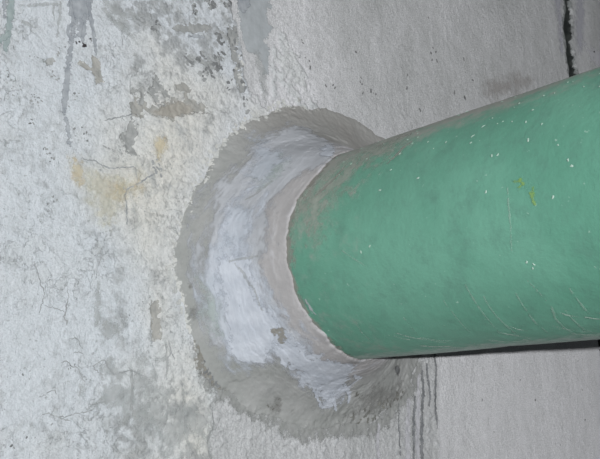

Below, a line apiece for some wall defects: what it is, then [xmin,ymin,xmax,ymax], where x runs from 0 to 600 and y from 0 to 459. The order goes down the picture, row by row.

damp [59,0,97,147]
peeling [103,73,213,157]
crack [563,0,579,77]
peeling [166,0,333,361]
damp [350,354,438,459]